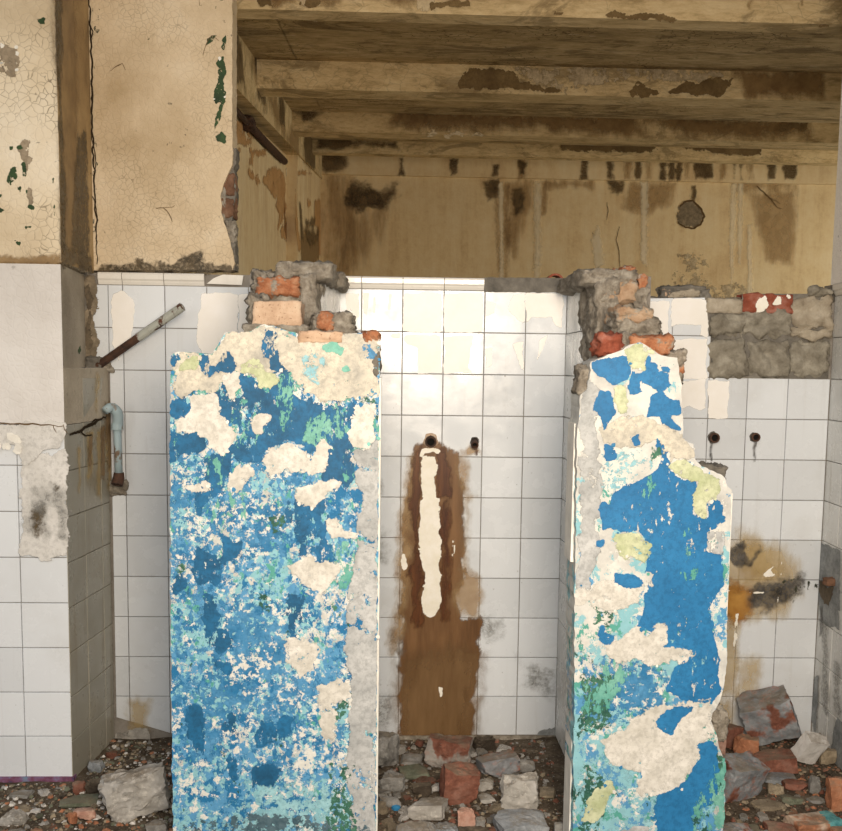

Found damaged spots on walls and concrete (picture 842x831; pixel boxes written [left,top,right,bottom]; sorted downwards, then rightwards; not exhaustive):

crack [88,0,125,263]
damp [237,35,245,84]
spalling [207,35,301,273]
damp [258,91,395,225]
damp [391,113,810,139]
damp [299,202,319,262]
peeling [672,253,835,380]
crack [0,415,107,437]
peeling [599,385,721,519]
peeling [170,325,381,831]
corrosion [394,442,483,735]
peeling [600,698,715,797]